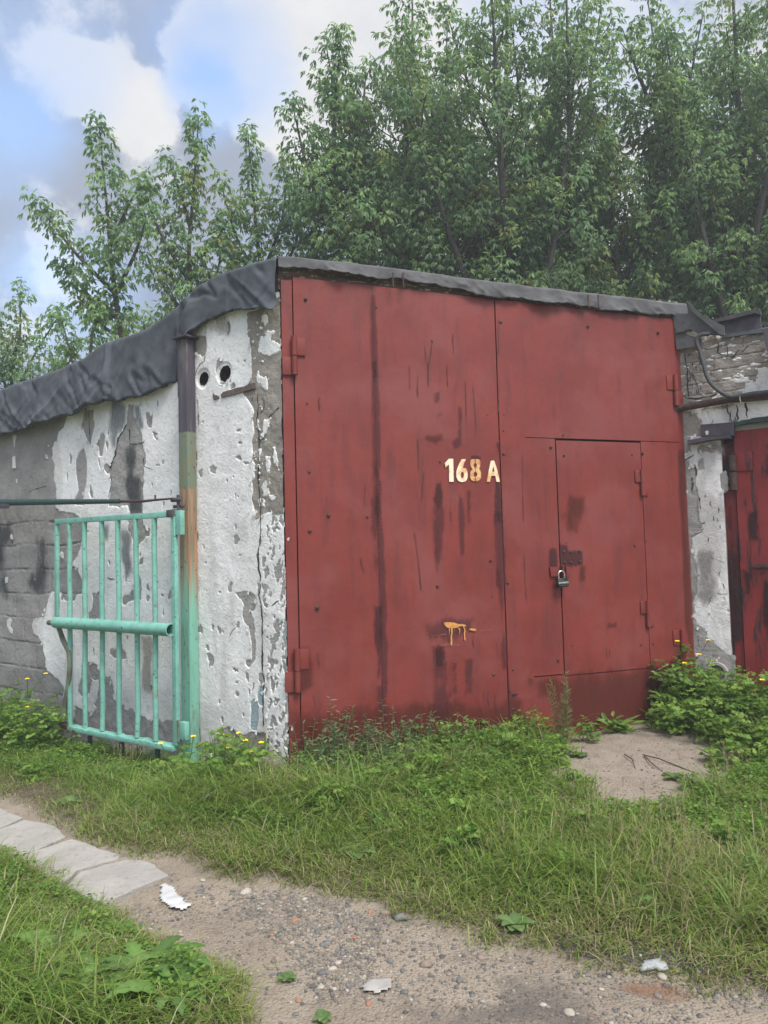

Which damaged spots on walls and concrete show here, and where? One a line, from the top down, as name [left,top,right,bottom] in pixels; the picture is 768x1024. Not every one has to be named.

flaking render [0,400,182,762]
peeling [194,295,293,764]
crack [229,393,279,726]
corrosion [297,297,520,750]
corrosion [550,544,584,579]
peeling [680,327,768,700]
corrosion [728,509,750,642]
corrosion [748,511,758,540]